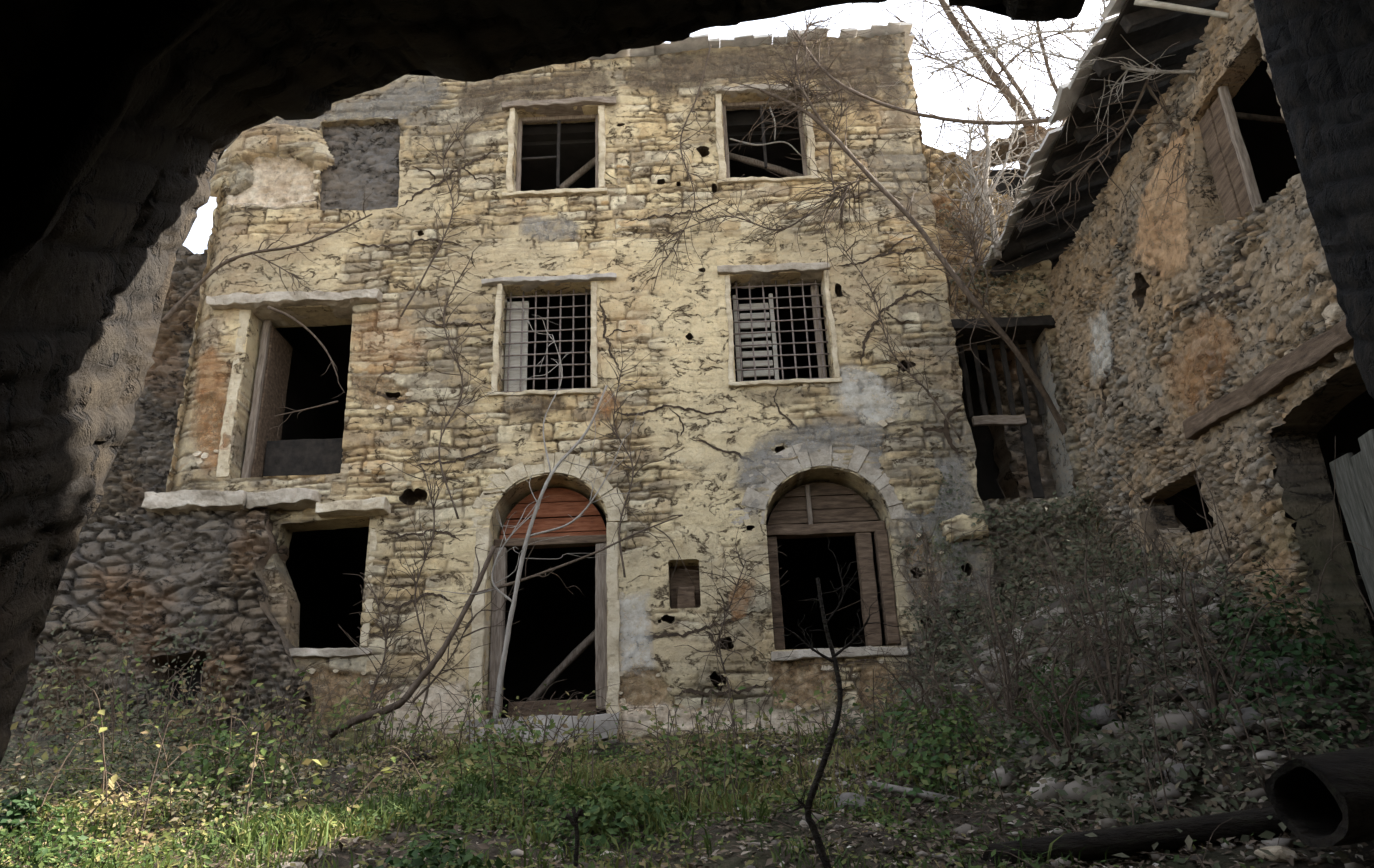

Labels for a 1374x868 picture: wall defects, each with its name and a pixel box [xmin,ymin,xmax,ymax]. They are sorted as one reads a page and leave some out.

peeling [1135,127,1189,277]
spalling [191,396,224,465]
leakage [740,424,883,487]